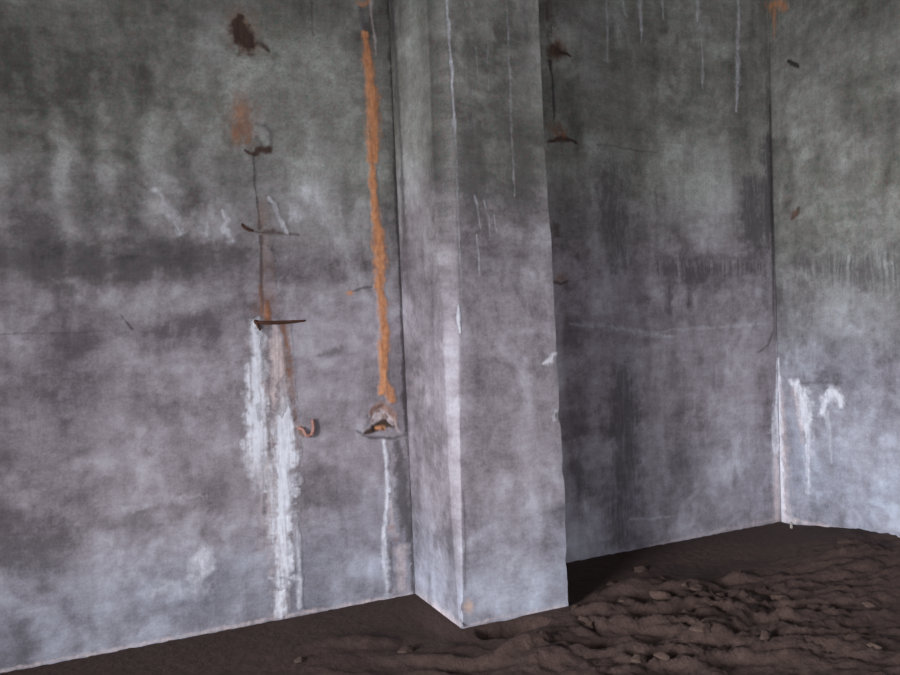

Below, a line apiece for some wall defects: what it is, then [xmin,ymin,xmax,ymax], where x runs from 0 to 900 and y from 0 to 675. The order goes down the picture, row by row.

rust [218,0,272,60]
rust [241,223,301,237]
rust [345,0,398,405]
water stain [444,0,490,334]
water stain [788,240,900,309]
efflorescence [233,315,304,621]
rust [243,273,306,457]
spalling [354,399,405,442]
water stain [767,356,847,524]